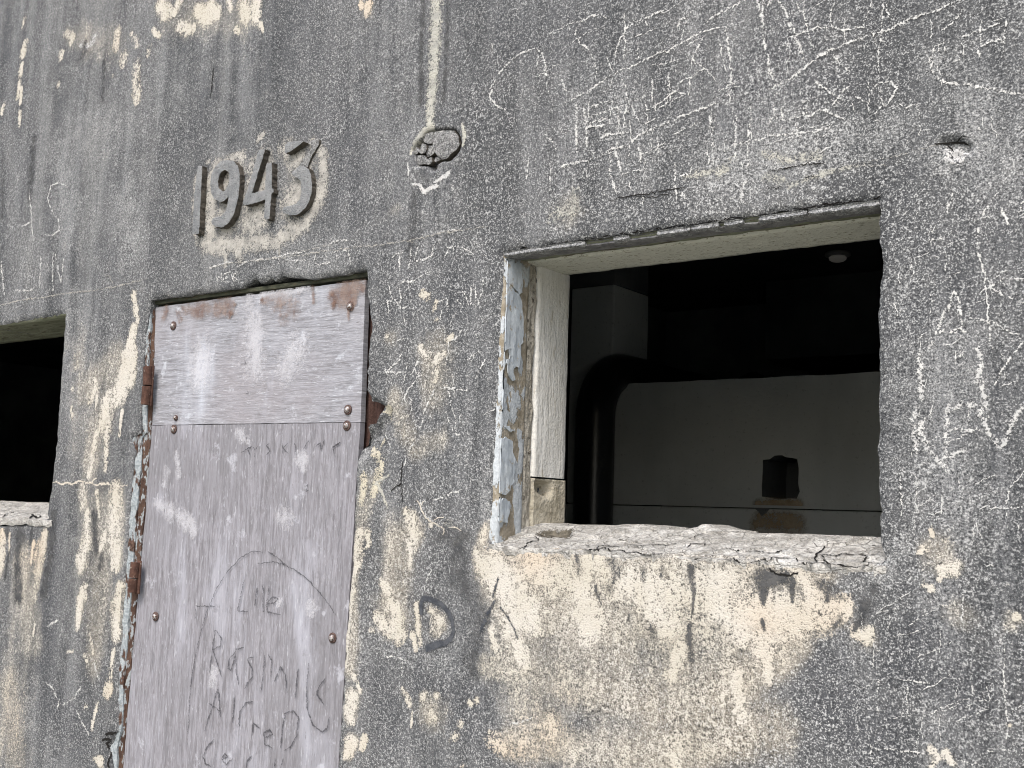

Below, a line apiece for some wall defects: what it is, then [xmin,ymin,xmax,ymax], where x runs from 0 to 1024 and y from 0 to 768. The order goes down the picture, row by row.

rust [329,280,365,319]
damp [39,509,57,598]
damp [91,510,104,571]
crack [587,533,874,576]
damp [594,558,621,605]
damp [685,564,696,663]
damp [753,567,797,630]
damp [816,578,839,603]
damp [851,583,878,634]